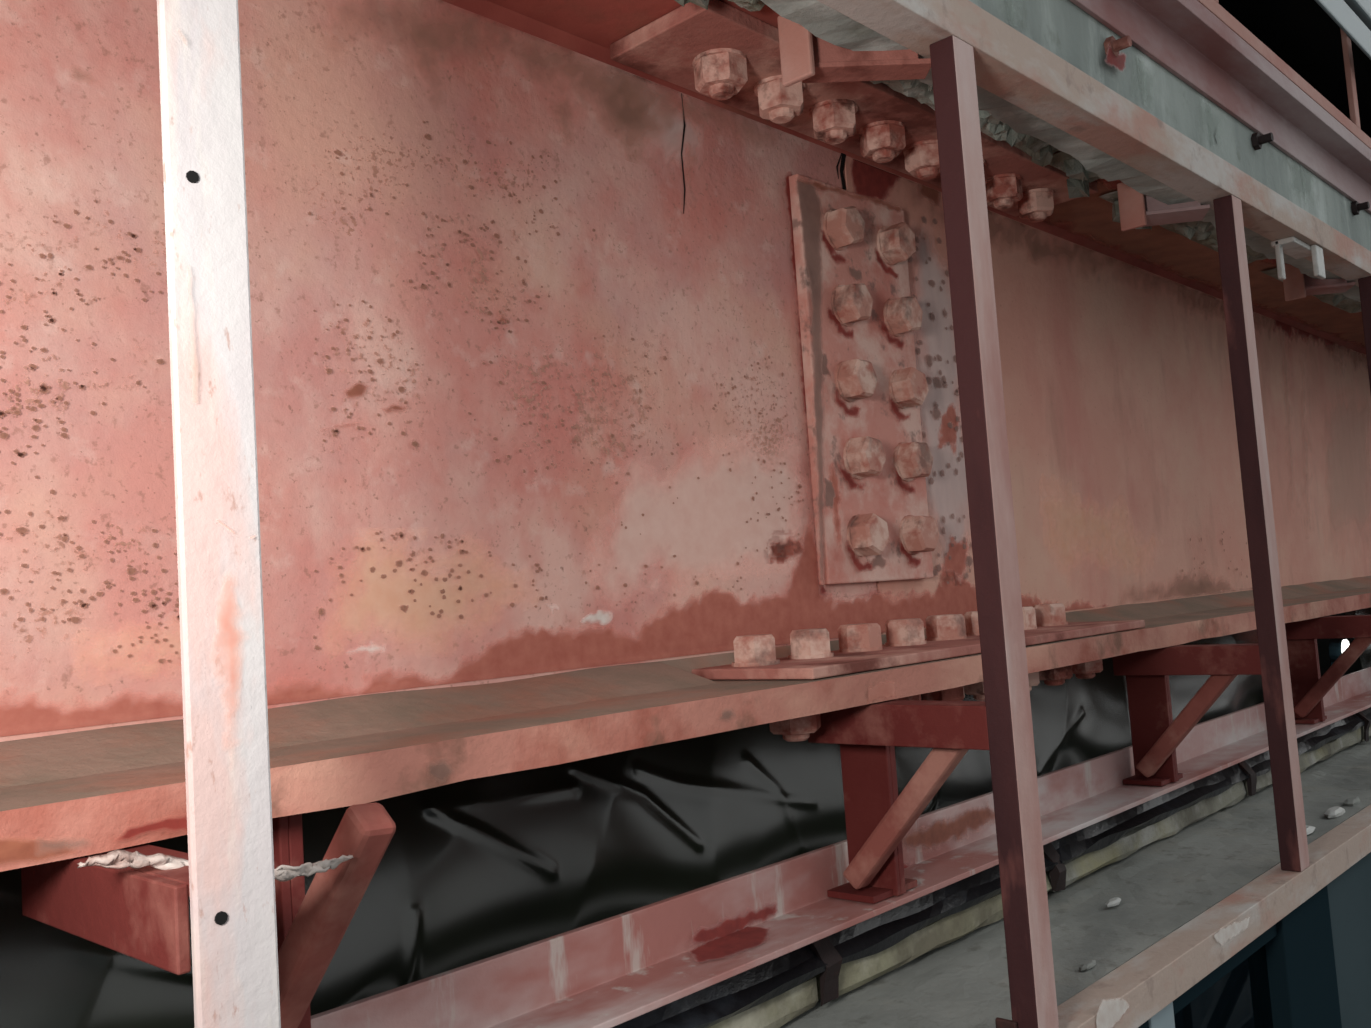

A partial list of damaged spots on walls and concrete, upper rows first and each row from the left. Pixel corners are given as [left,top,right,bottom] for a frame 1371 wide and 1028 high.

crack [679,93,687,214]
spalling [870,79,935,111]
spalling [979,110,1218,252]
rust [35,232,162,345]
rust [409,212,550,333]
spalling [1246,245,1283,282]
rust [0,325,69,465]
rust [314,300,419,447]
peeling [267,217,977,705]
rust [0,511,176,623]
peeling [0,694,183,737]
peeling [1096,999,1129,1028]